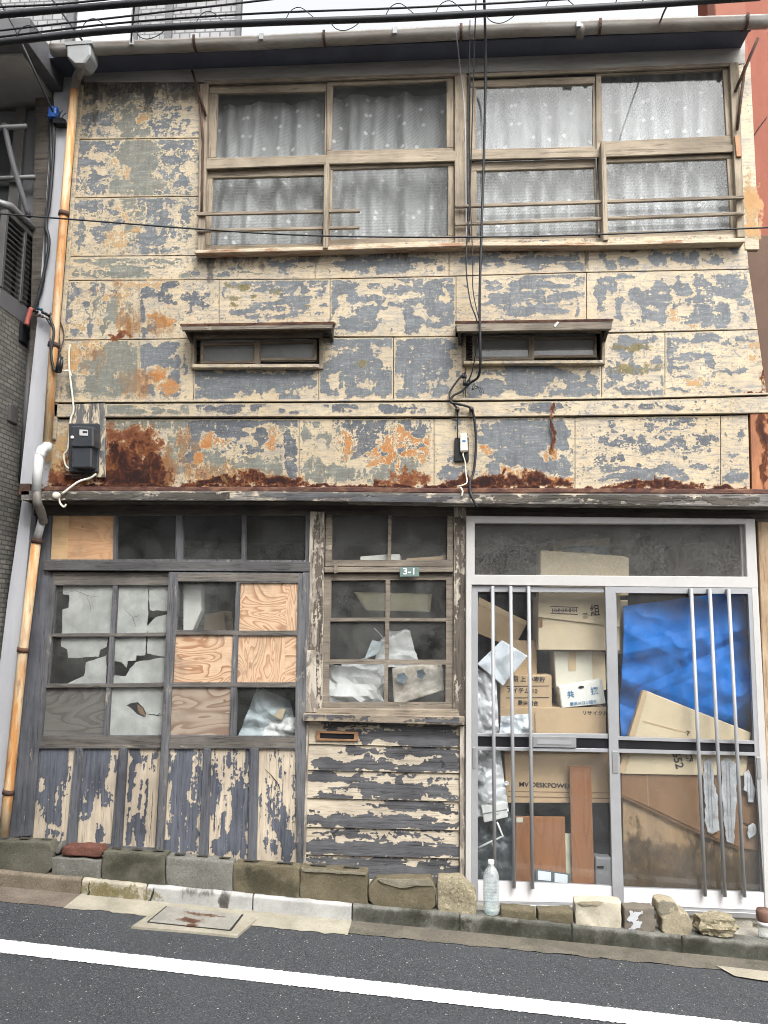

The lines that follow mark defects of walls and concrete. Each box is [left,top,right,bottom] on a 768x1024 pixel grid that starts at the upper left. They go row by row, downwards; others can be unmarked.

peeling [42,82,762,505]
rust [42,403,768,490]
peeling [36,514,465,888]